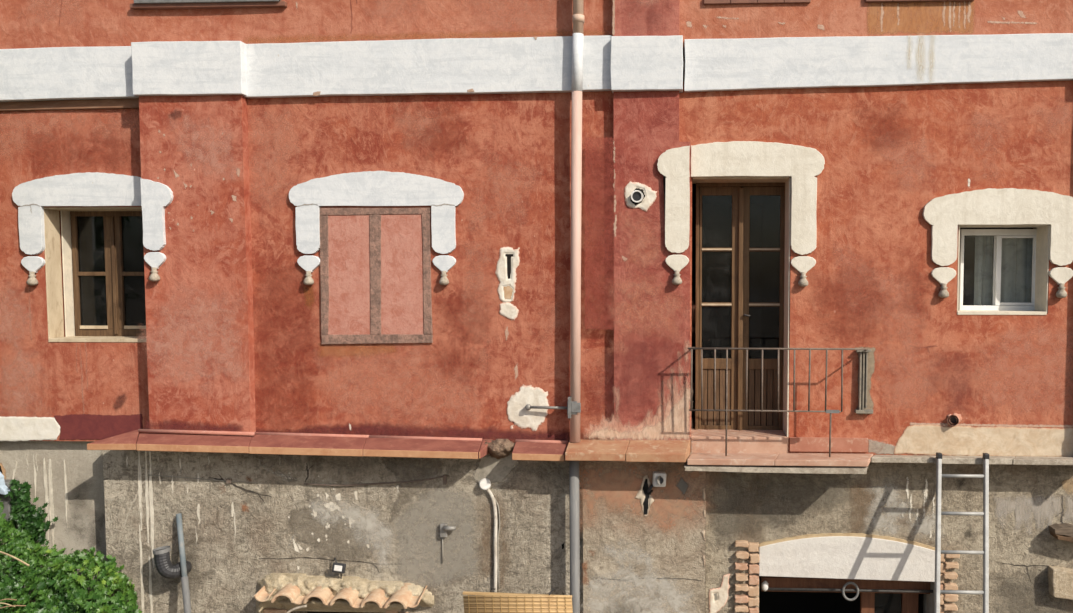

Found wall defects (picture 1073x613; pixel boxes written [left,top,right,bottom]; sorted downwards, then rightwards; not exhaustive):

corrosion [868,1,974,34]
flaking render [495,247,520,340]
water stain [54,395,240,440]
flaking render [485,365,549,459]
peeling [586,341,692,440]
water stain [12,454,68,548]
water stain [126,451,182,613]
crack [208,474,271,503]
hole [634,475,654,517]